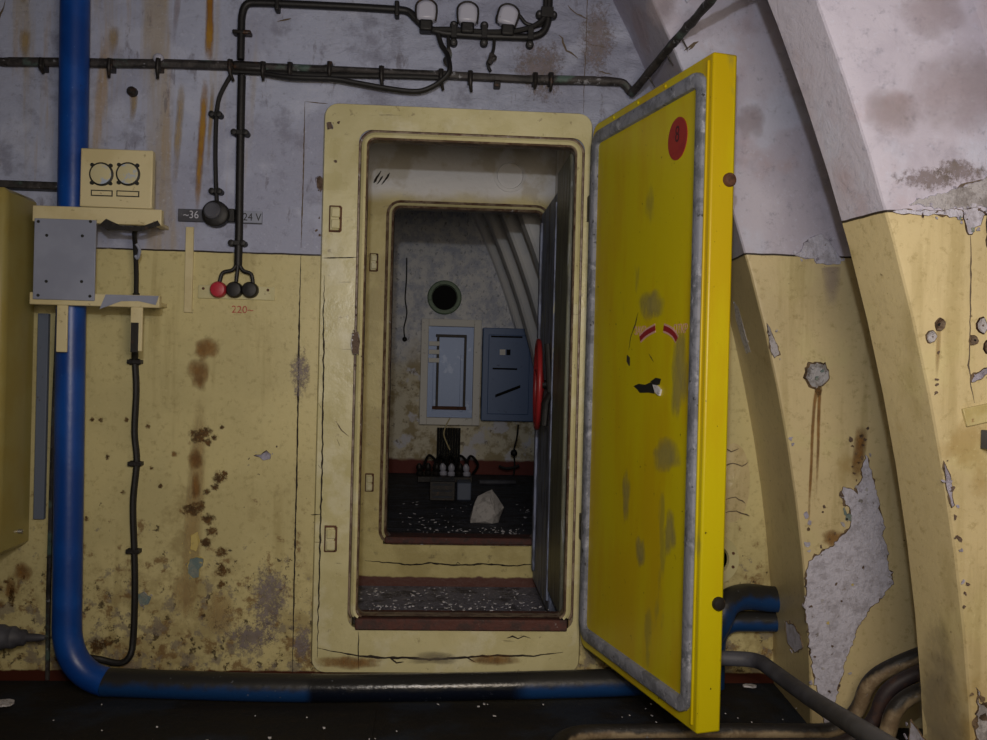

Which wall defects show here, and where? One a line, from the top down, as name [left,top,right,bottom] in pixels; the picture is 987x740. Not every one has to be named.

water stain [196,98,213,192]
water stain [894,160,983,189]
peeling [892,174,987,247]
corrosion [192,341,215,386]
water stain [292,357,310,395]
corrosion [809,387,822,493]
corrosion [854,436,865,464]
corrosion [183,425,231,623]
peeling [785,427,894,702]
water stain [226,567,287,651]
peeling [903,719,926,740]
peeling [970,688,987,740]